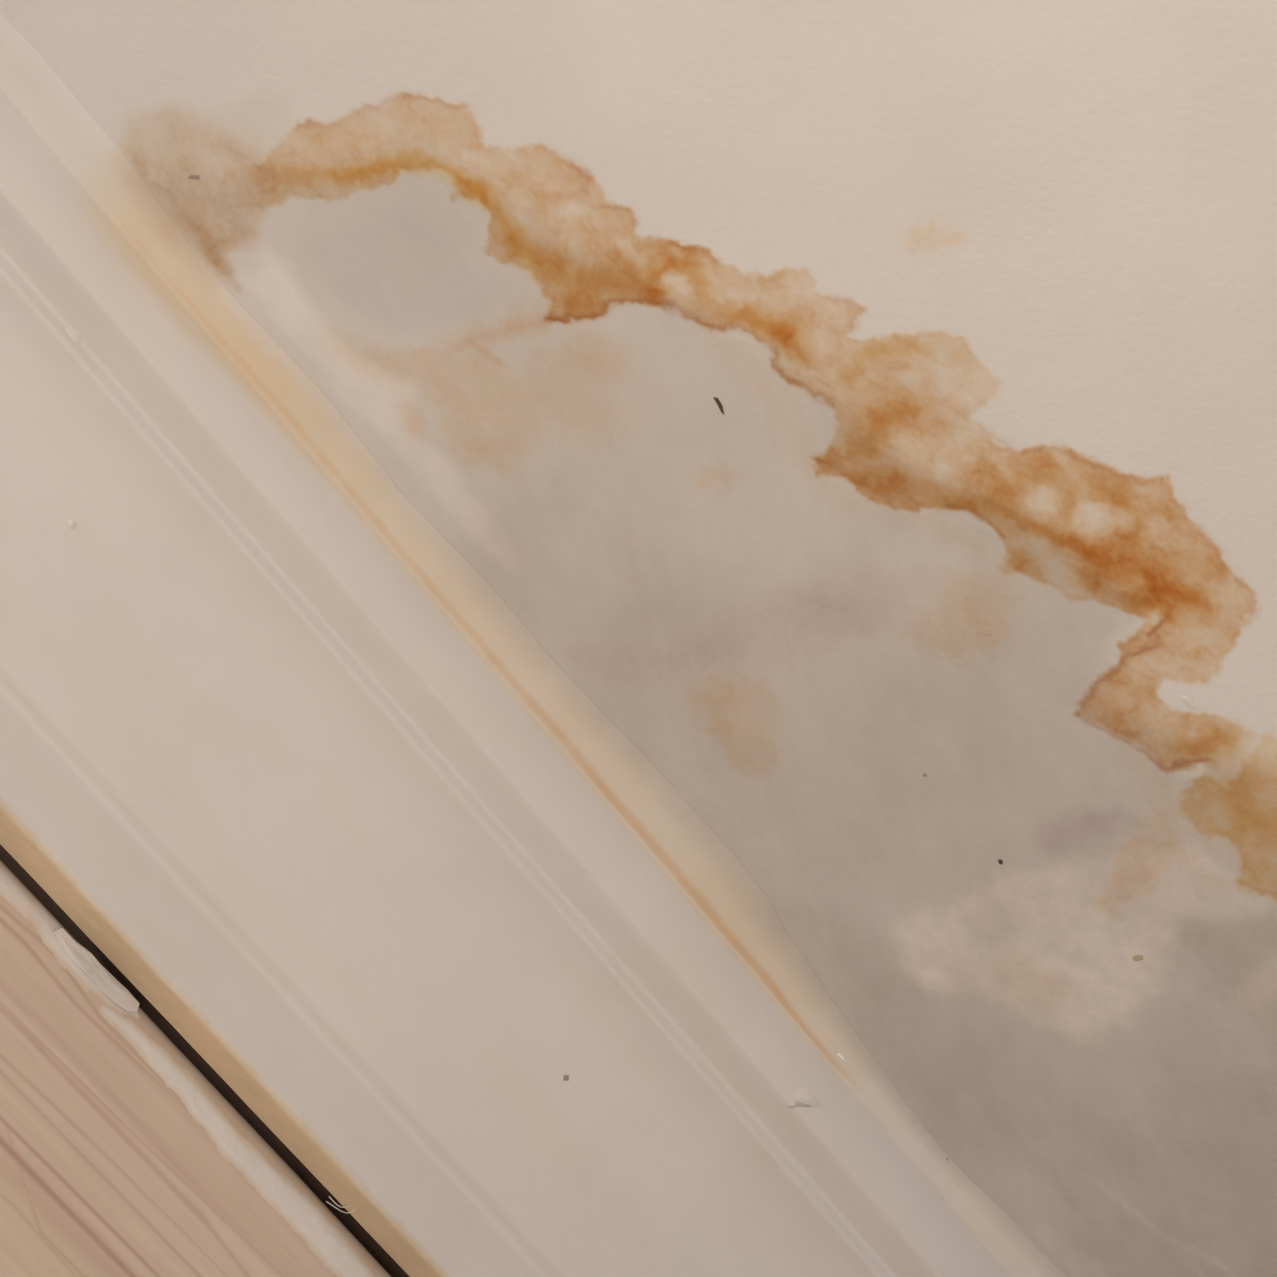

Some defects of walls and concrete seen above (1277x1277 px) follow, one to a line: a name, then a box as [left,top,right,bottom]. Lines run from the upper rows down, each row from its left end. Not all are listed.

water stain [27,104,1066,1277]
water stain [581,561,1277,1277]